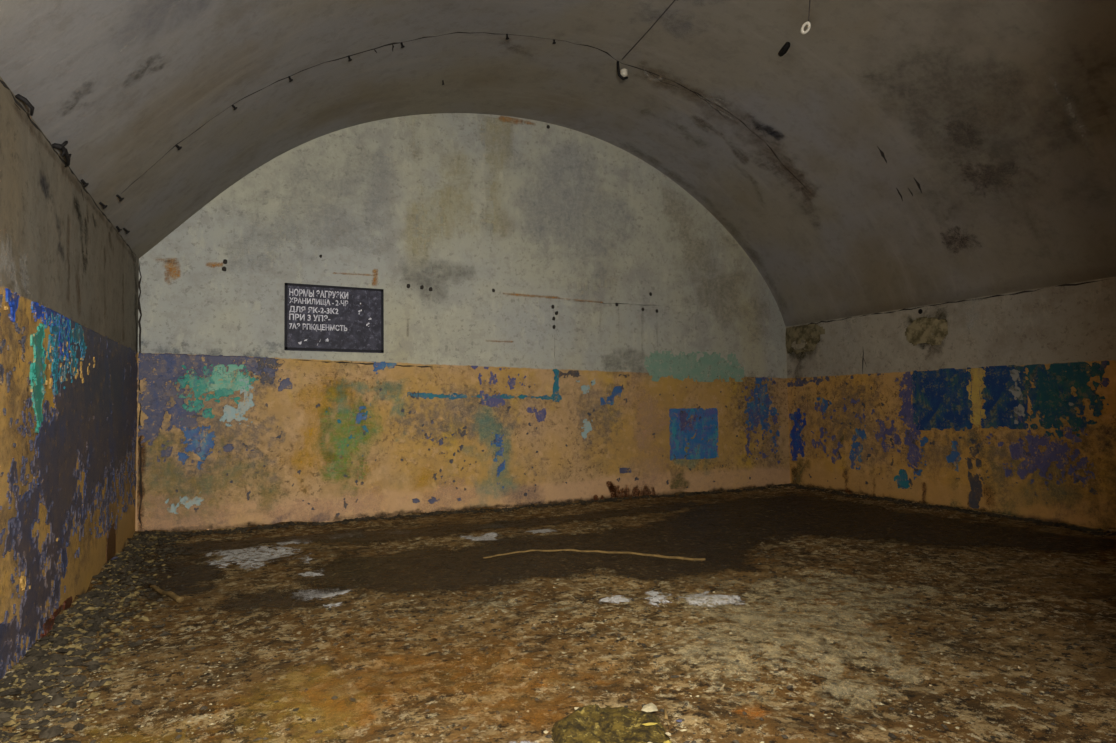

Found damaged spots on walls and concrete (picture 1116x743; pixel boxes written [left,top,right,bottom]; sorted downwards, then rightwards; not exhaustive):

peeling [0,288,285,680]
peeling [401,391,497,501]
peeling [471,366,562,412]
peeling [557,370,629,421]
peeling [725,372,939,487]
peeling [946,361,1110,504]